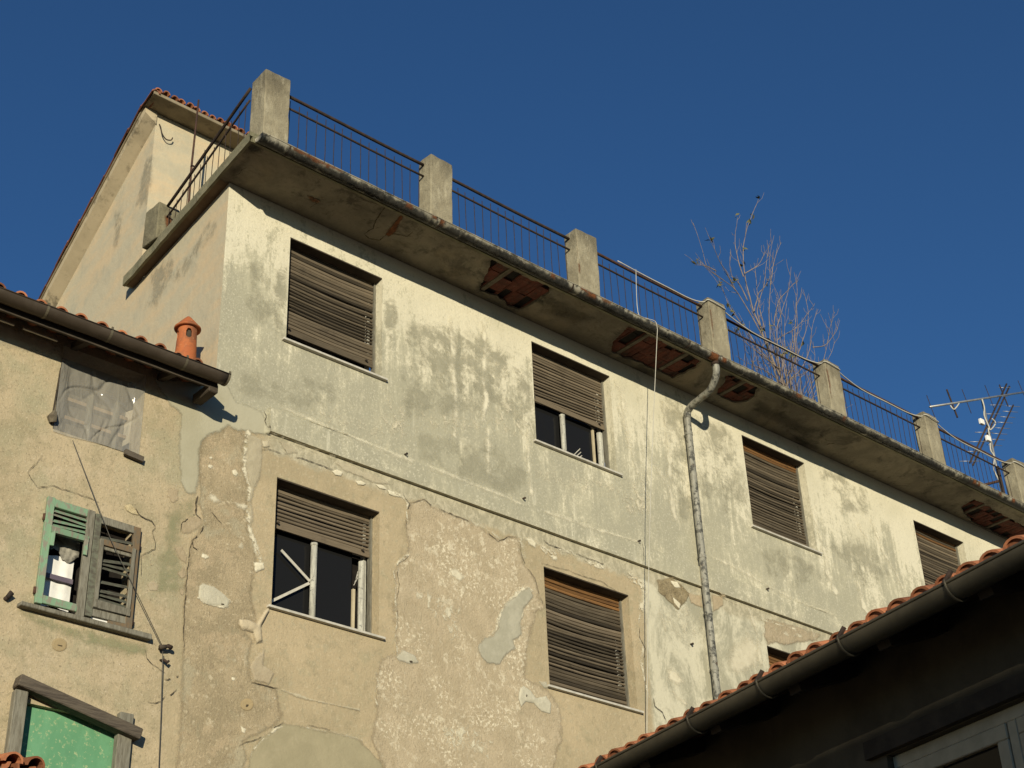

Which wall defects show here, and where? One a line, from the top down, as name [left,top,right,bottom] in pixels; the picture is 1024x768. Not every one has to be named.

spalling [480,260,550,308]
leakage [286,319,614,495]
spalling [611,327,700,377]
spalling [717,375,757,401]
spalling [961,500,1024,538]
flaking render [176,426,360,768]
flaking render [330,457,604,768]
flaking render [629,573,703,690]